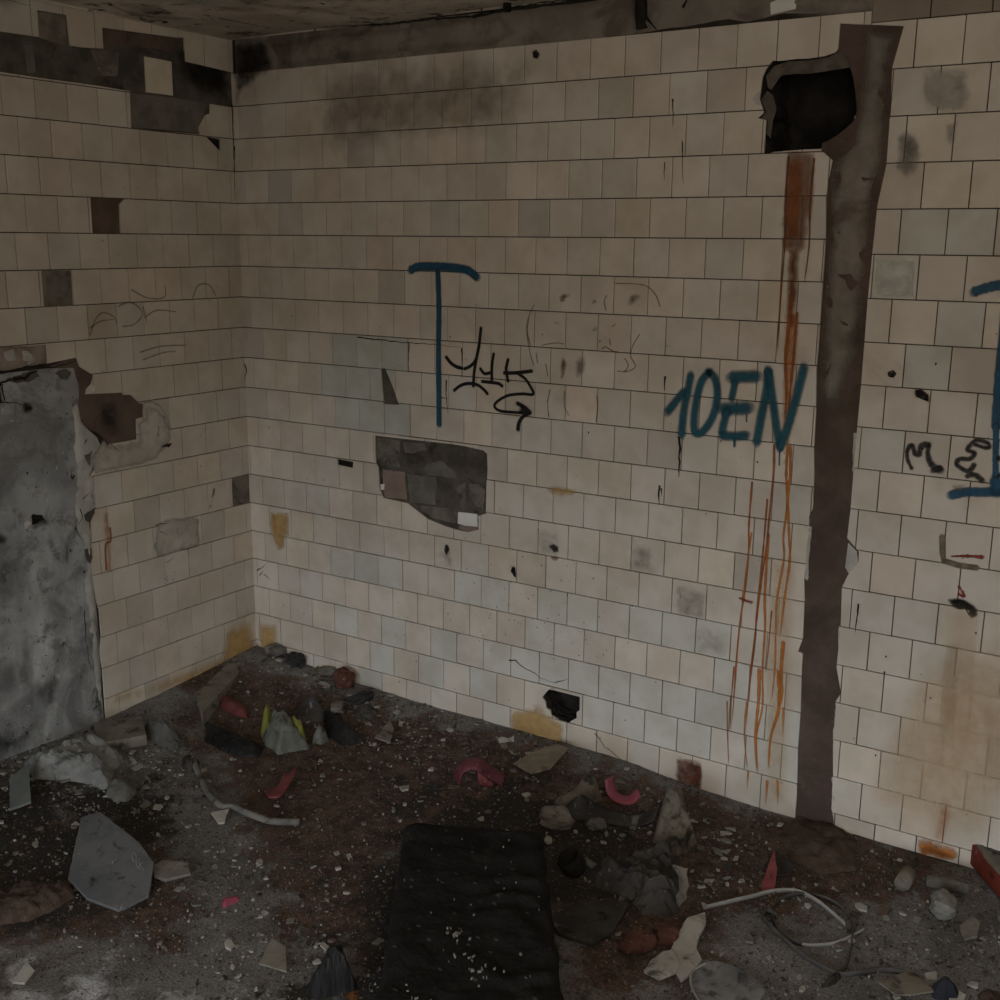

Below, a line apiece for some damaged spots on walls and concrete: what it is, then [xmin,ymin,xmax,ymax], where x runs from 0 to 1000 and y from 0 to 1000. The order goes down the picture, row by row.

peeling [0,0,903,153]
peeling [89,188,125,241]
peeling [40,270,73,307]
corrosion [777,154,815,415]
spalling [0,345,143,461]
spalling [24,514,44,528]
damp [271,515,287,548]
peeling [376,436,488,538]
corrosion [726,444,792,781]
spalling [544,689,580,721]